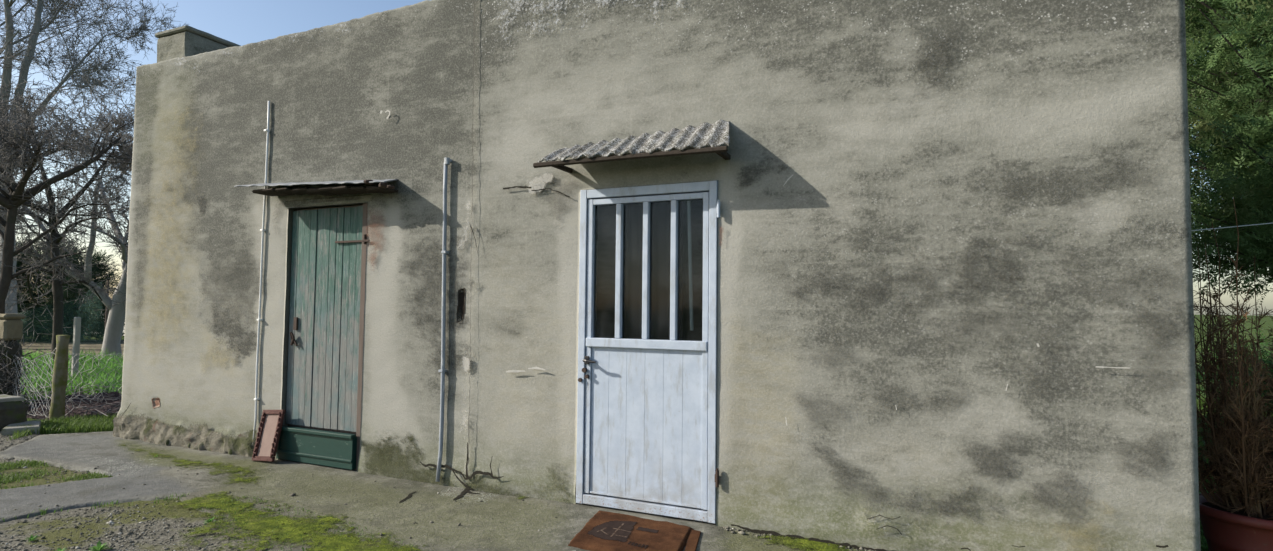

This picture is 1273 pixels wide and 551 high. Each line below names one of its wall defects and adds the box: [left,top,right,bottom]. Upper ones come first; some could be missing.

peeling [529,173,553,194]
water stain [363,435,445,485]
crack [731,524,895,551]